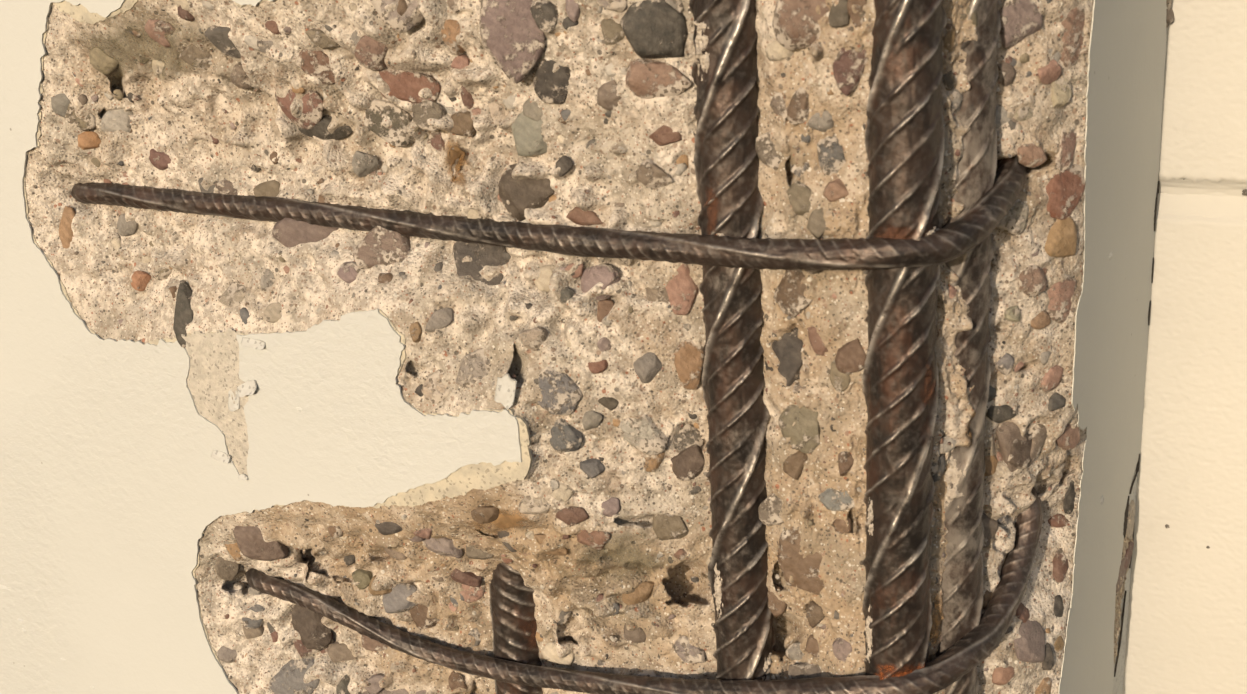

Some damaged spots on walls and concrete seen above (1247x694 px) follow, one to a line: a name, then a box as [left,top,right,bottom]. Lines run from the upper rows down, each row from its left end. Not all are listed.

rust [447,143,468,184]
spalling [755,0,876,240]
spalling [25,0,717,694]
spalling [927,0,1094,694]
rust [529,620,538,648]
spalling [758,269,869,680]
rust [929,597,941,644]
spalling [1114,500,1135,663]